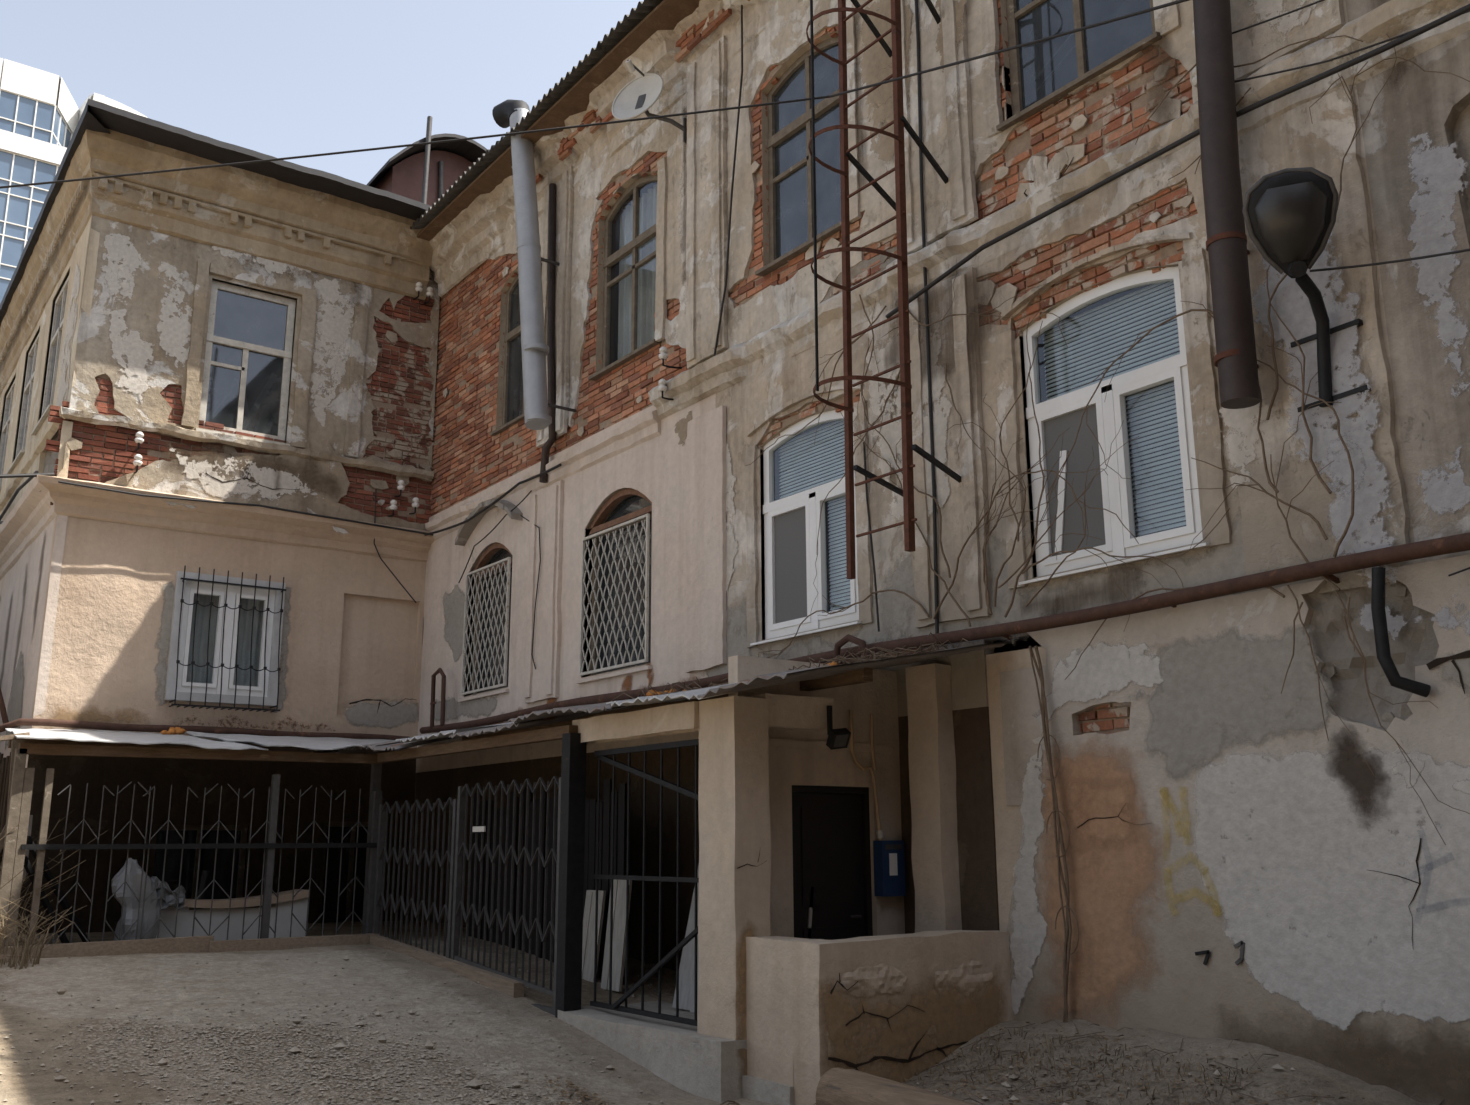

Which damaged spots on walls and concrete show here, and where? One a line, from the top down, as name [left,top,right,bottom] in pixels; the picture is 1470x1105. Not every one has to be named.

flaking render [43,135,689,524]
flaking render [728,63,864,308]
flaking render [822,0,1193,302]
flaking render [977,181,1198,339]
peeling [1219,397,1265,489]
peeling [1253,231,1439,730]
peeling [1407,133,1470,397]
peeling [934,641,1164,1015]
peeling [1194,748,1470,1031]
damp [1332,734,1385,815]
crack [1426,650,1470,694]
crack [828,973,968,1071]